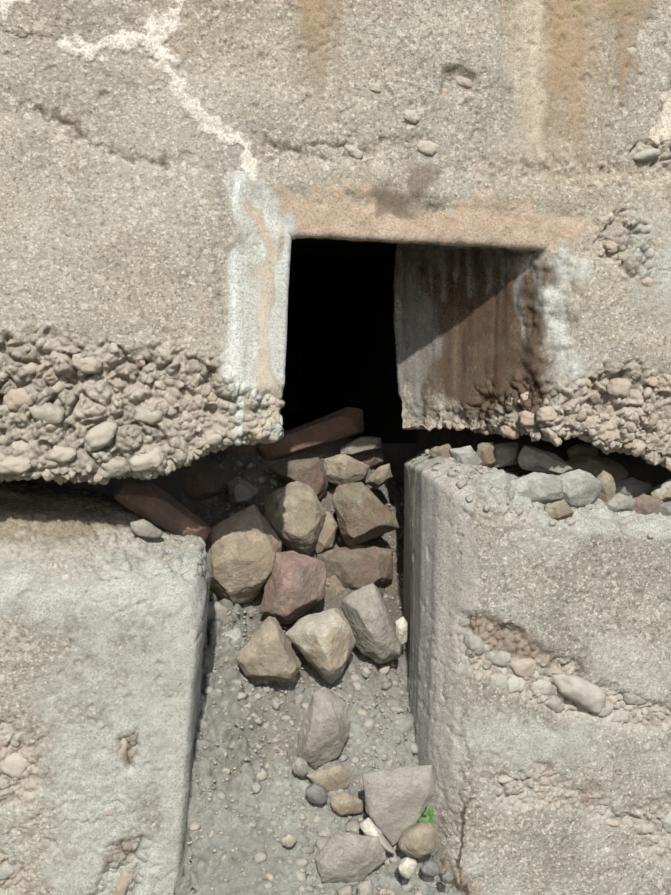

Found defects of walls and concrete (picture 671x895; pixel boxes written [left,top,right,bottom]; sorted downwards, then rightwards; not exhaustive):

crack [0,0,32,38]
crack [36,104,85,138]
crack [56,0,325,181]
spalling [632,90,671,163]
water stain [221,171,296,446]
spalling [0,342,242,542]
spalling [446,373,671,472]
spalling [453,611,670,734]
spalling [0,734,32,790]
crack [439,807,469,895]